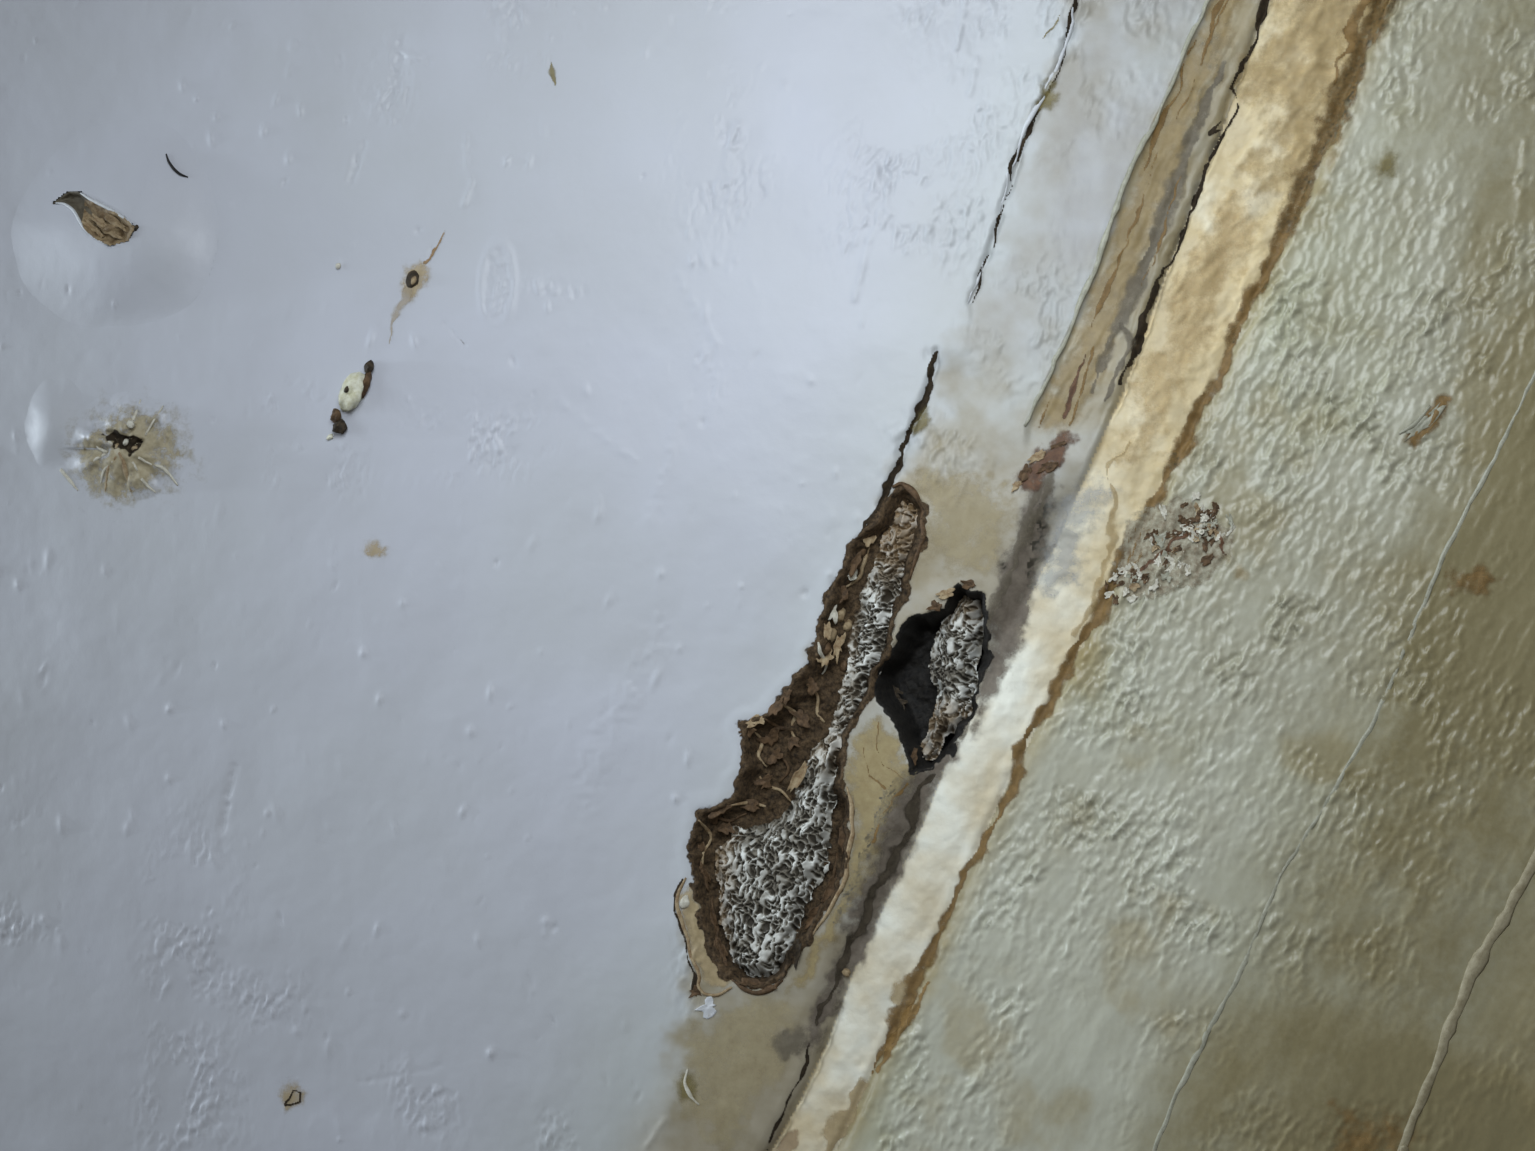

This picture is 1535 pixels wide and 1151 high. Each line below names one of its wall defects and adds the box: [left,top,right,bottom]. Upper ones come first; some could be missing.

corrosion [389,232,445,342]
crack [968,0,1078,303]
crack [1104,0,1269,401]
crack [857,351,938,537]
corrosion [1011,431,1079,533]
leakage [824,0,1400,1151]
peeling [1104,492,1235,605]
spalling [673,482,994,1019]
leakage [775,473,1056,1061]